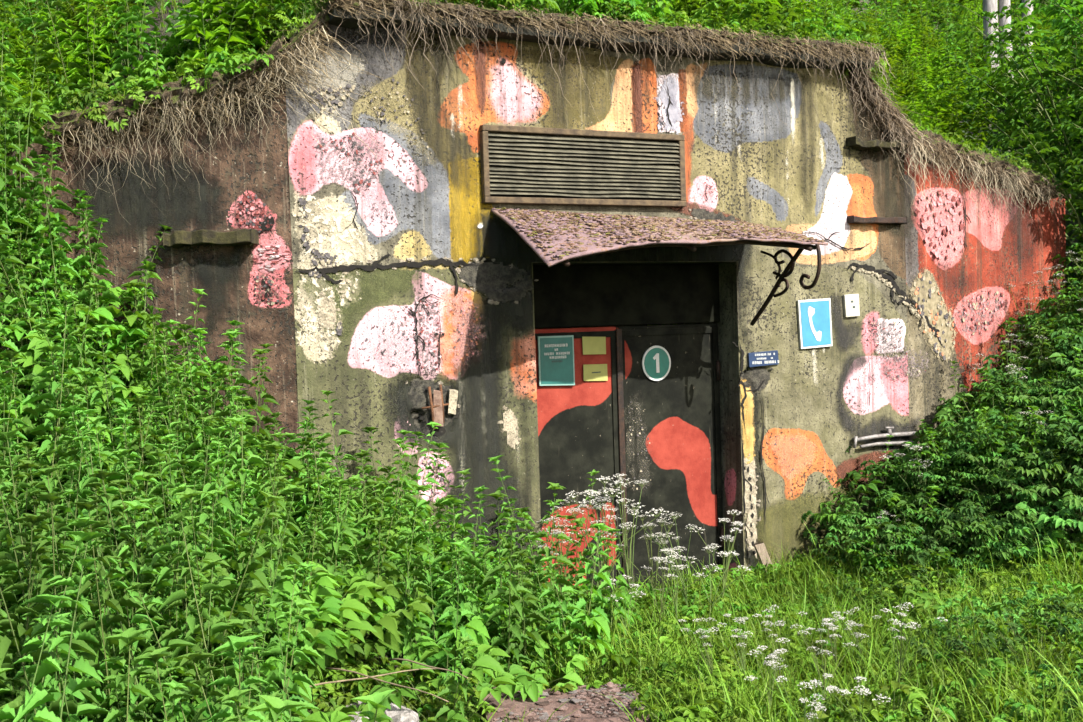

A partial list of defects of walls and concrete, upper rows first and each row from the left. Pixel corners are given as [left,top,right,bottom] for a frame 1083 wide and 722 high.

corrosion [634,62,642,133]
damp [75,155,223,237]
damp [189,245,243,330]
crack [801,232,943,354]
spalling [362,259,538,437]